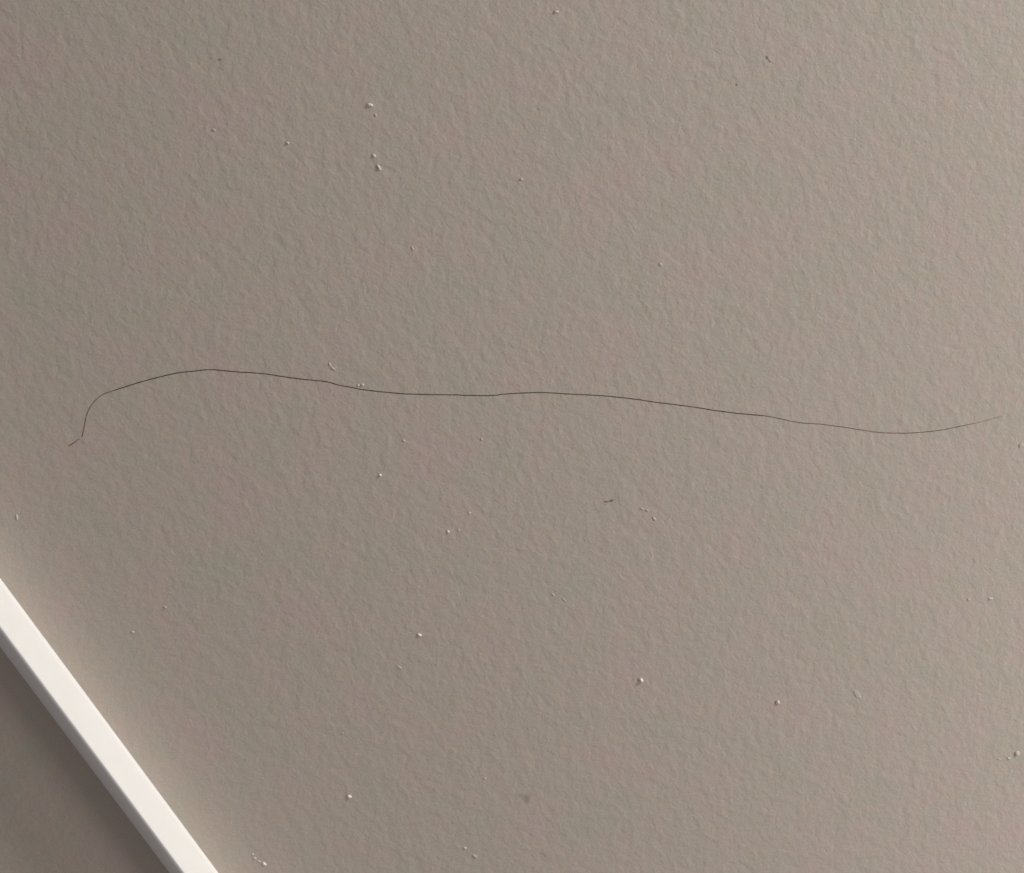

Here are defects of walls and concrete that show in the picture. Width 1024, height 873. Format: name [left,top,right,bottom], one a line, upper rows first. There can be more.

crack [68,369,1003,446]